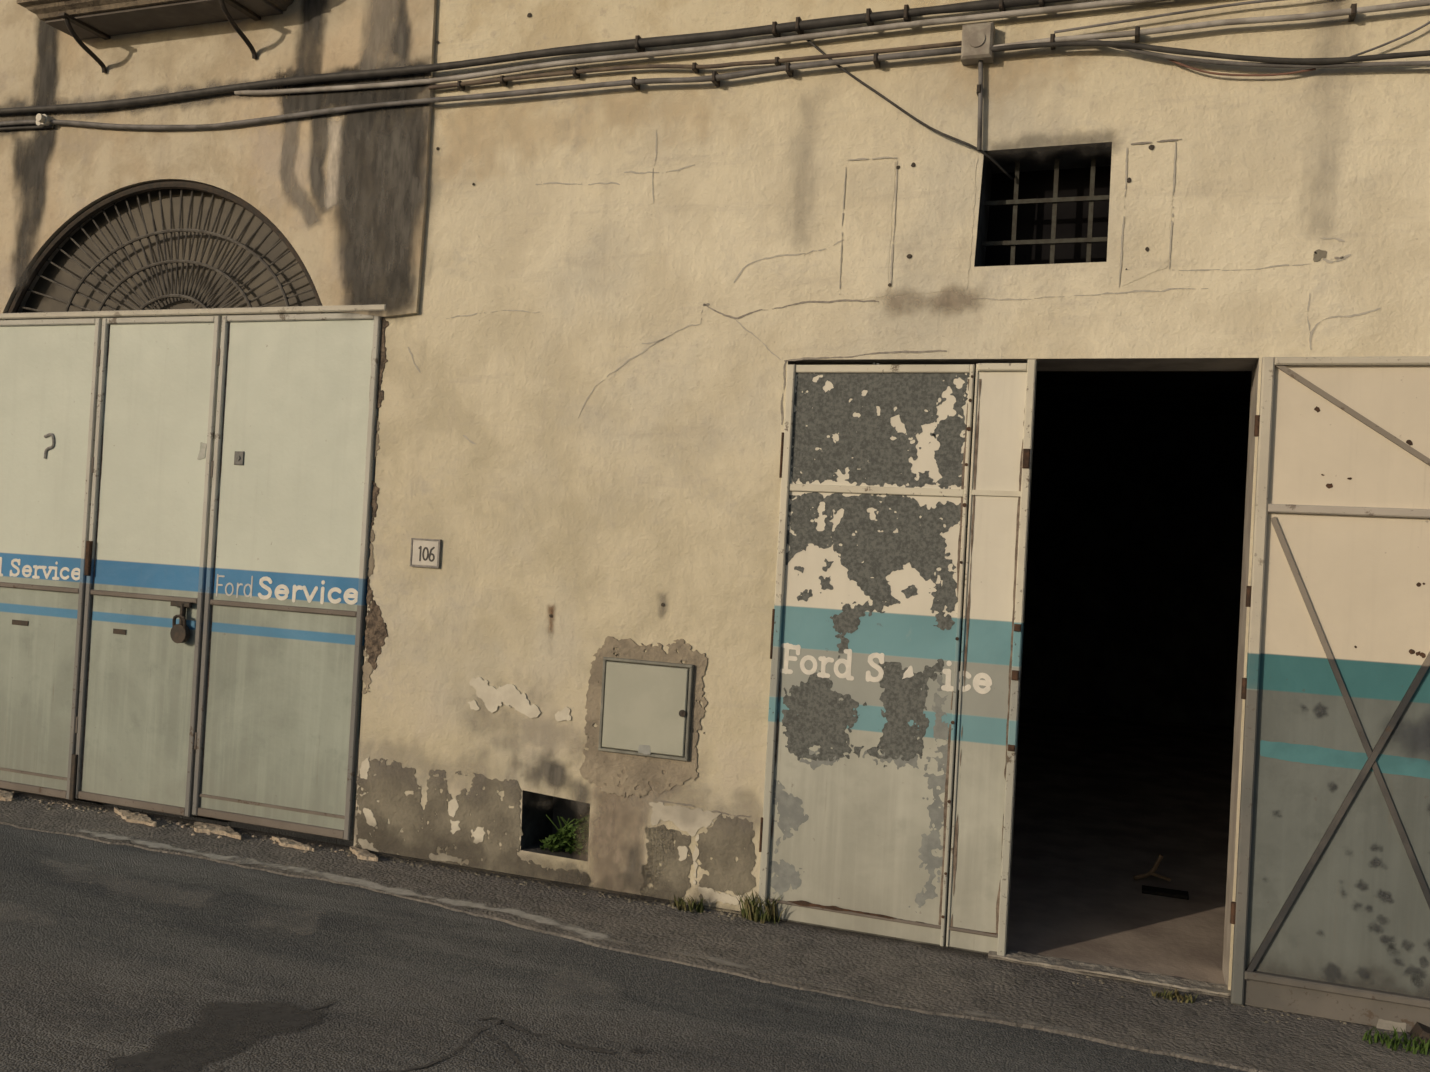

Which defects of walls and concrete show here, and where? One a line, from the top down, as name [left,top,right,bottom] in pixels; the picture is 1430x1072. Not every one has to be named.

water stain [0,0,430,313]
spalling [373,318,389,460]
crack [578,157,947,425]
water stain [889,290,972,310]
spalling [361,480,388,694]
peeling [354,757,591,889]
peeling [468,636,809,905]